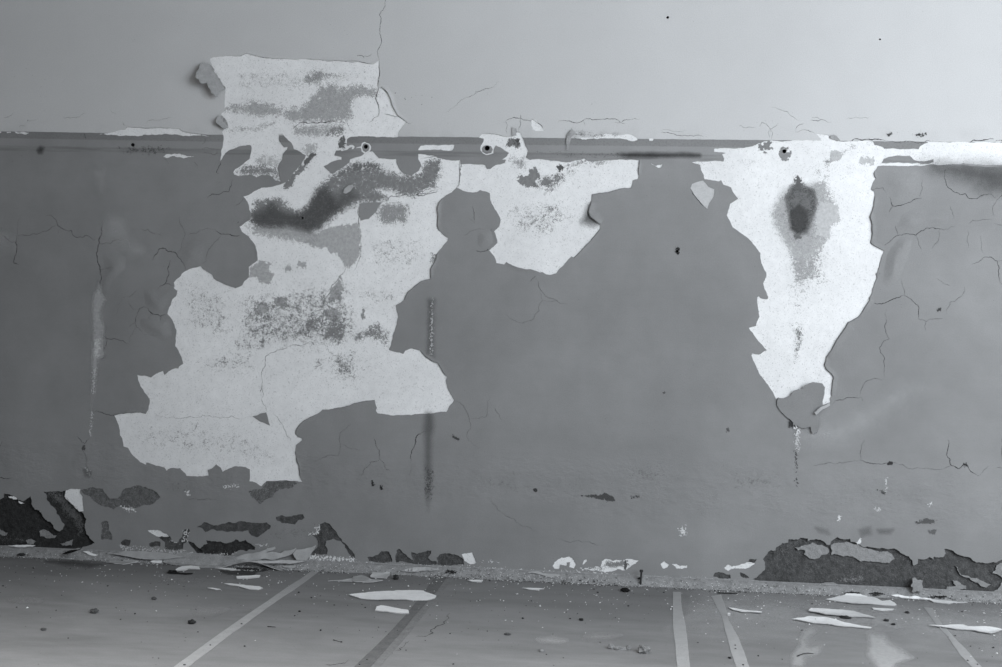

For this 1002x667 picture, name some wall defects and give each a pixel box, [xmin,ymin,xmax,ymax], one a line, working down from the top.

crack [296,0,410,129]
crack [4,215,239,286]
peeling [105,49,662,504]
leakage [784,175,819,240]
peeling [691,134,1002,434]
crack [872,171,1002,281]
leakage [91,285,105,395]
flaking render [0,485,160,556]
flaking render [148,514,304,556]
flaking render [714,537,1002,629]